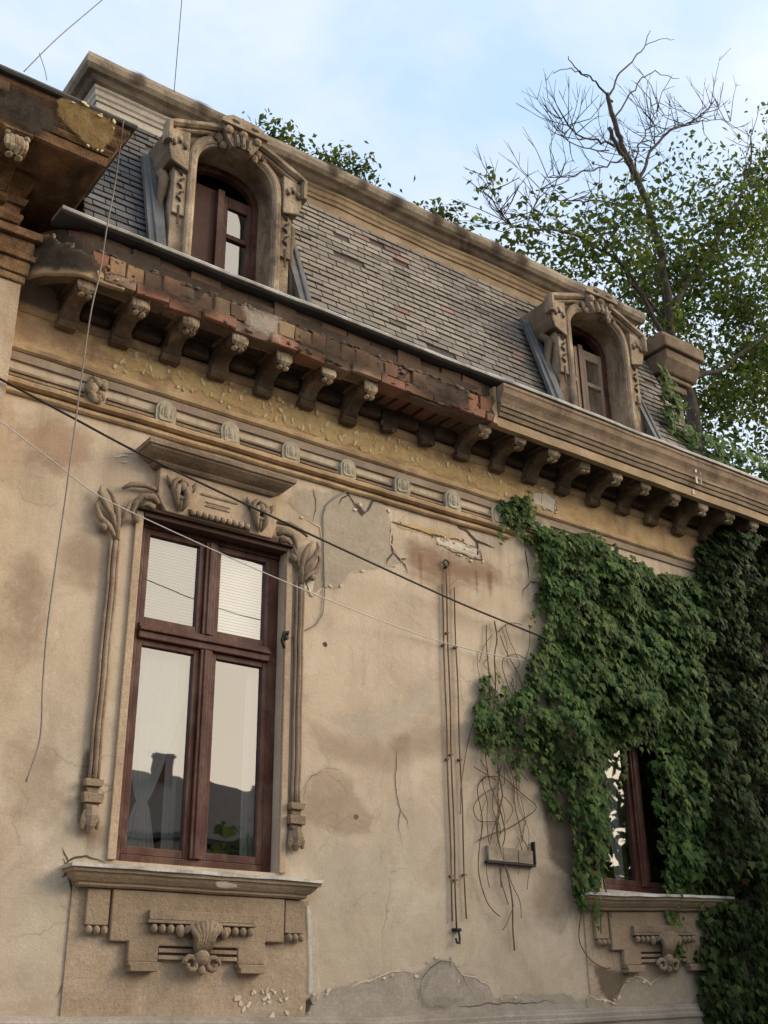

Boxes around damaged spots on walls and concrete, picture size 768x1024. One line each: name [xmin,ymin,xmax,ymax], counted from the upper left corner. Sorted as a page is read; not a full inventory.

peeling [57,98,116,153]
spalling [26,230,498,429]
peeling [68,333,559,514]
peeling [290,484,485,597]
crack [395,752,408,841]
flaking render [234,956,703,1018]